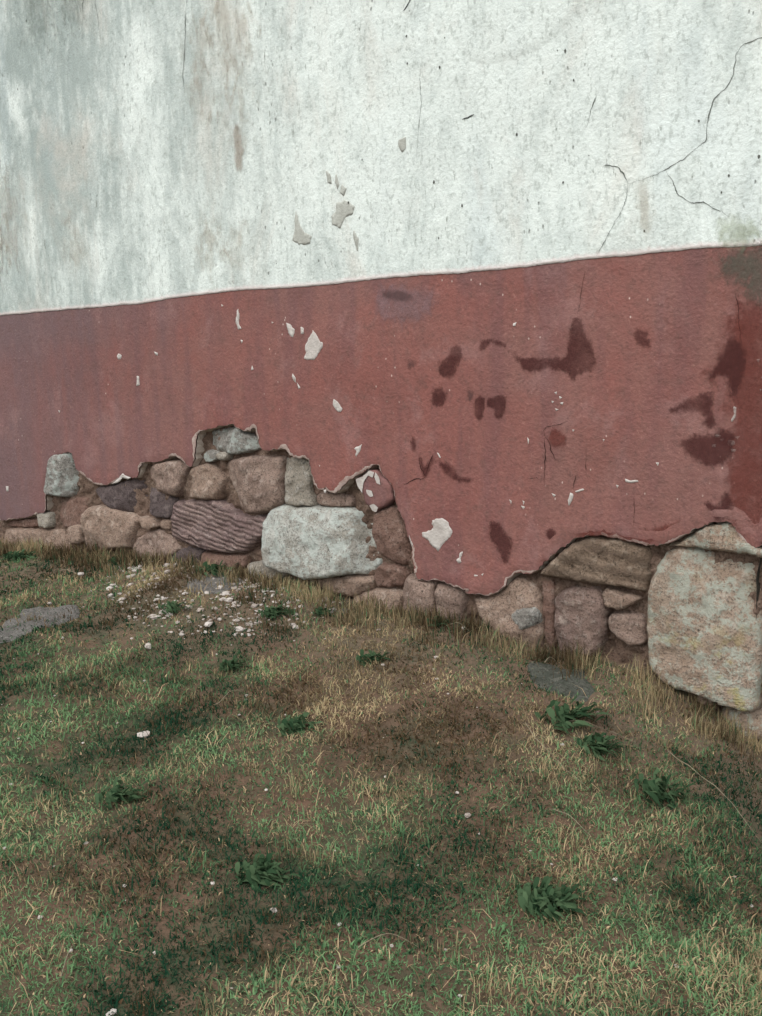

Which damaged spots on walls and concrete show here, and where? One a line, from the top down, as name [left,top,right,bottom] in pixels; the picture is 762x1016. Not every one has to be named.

crack [577,37,762,314]
peeling [326,171,355,228]
peeling [292,213,312,245]
peeling [286,323,323,360]
water stain [439,348,461,377]
water stain [517,318,595,380]
water stain [433,389,445,406]
water stain [475,396,506,419]
water stain [671,304,762,524]
flaking render [0,424,762,621]
water stain [490,522,511,563]
flaking render [595,631,651,670]